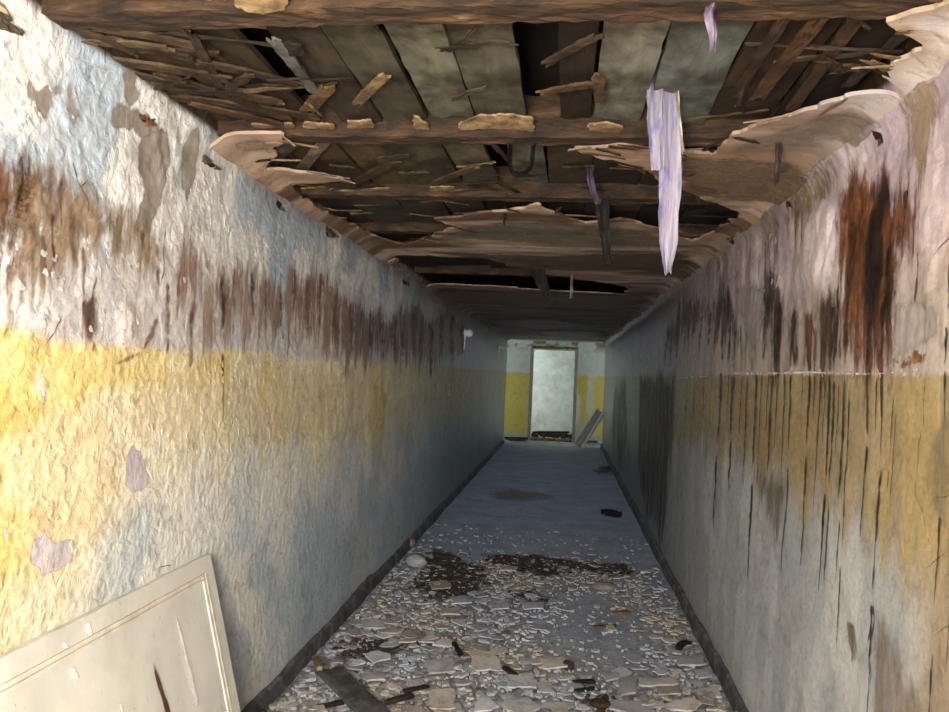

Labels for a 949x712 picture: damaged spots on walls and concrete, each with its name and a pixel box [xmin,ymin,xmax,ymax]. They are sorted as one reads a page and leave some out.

rust [0,154,31,263]
peeling [2,74,80,137]
peeling [92,69,170,233]
peeling [181,128,333,266]
rust [82,248,97,349]
rust [144,240,464,420]
leakage [664,284,729,359]
rust [713,163,922,642]
peeling [125,446,148,492]
leakage [610,372,673,547]
leakage [847,624,855,658]
leakage [875,629,916,712]